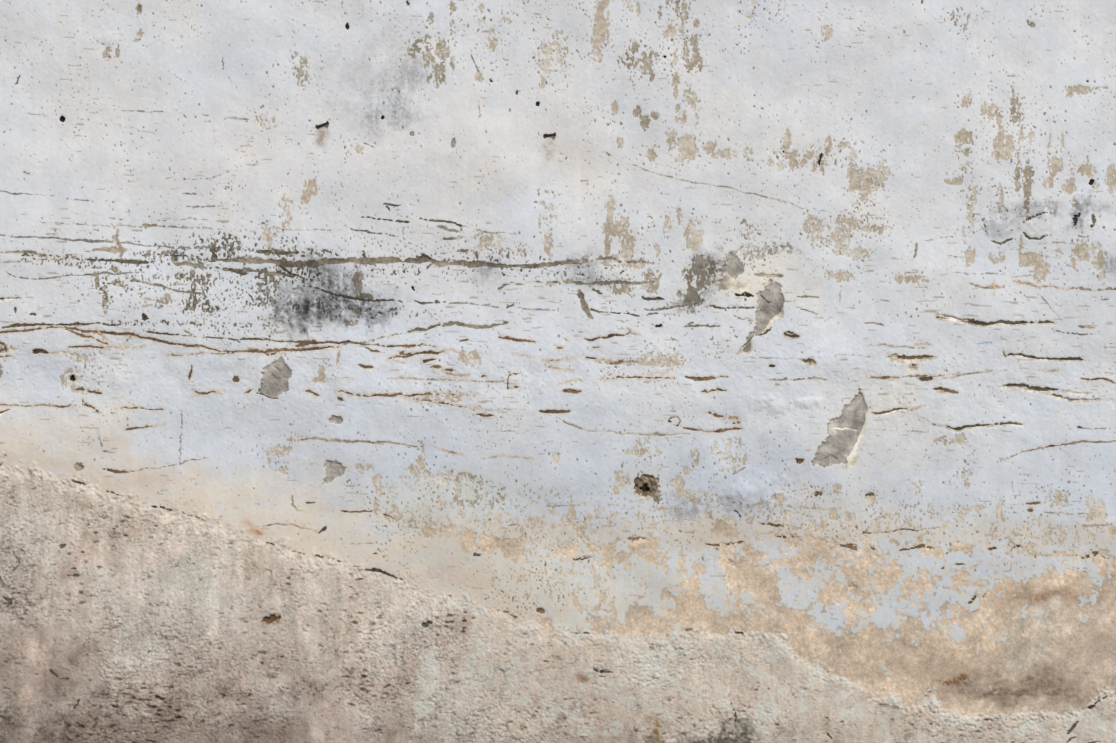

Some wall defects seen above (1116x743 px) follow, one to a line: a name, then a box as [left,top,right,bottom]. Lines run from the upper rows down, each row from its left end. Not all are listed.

peeling [617,0,753,164]
peeling [960,88,1116,220]
crack [72,390,216,496]
flaking render [256,352,292,399]
crack [0,190,665,356]
crack [305,374,512,407]
flaking render [339,191,884,355]
flaking render [795,388,922,469]
crack [716,322,1007,381]
crack [957,272,1116,348]
crack [256,497,404,580]
peeling [322,410,1116,717]